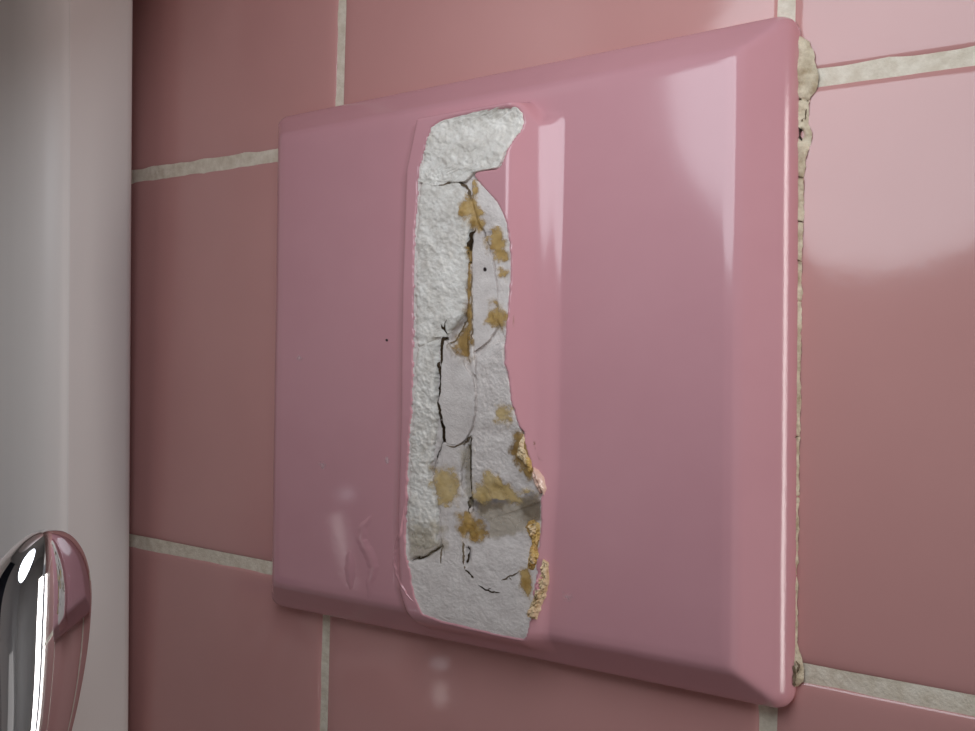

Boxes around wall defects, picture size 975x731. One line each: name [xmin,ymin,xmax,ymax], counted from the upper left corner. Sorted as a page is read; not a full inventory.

crack [438,181,473,200]
crack [437,228,476,513]
spalling [405,106,542,639]
crack [412,543,519,593]